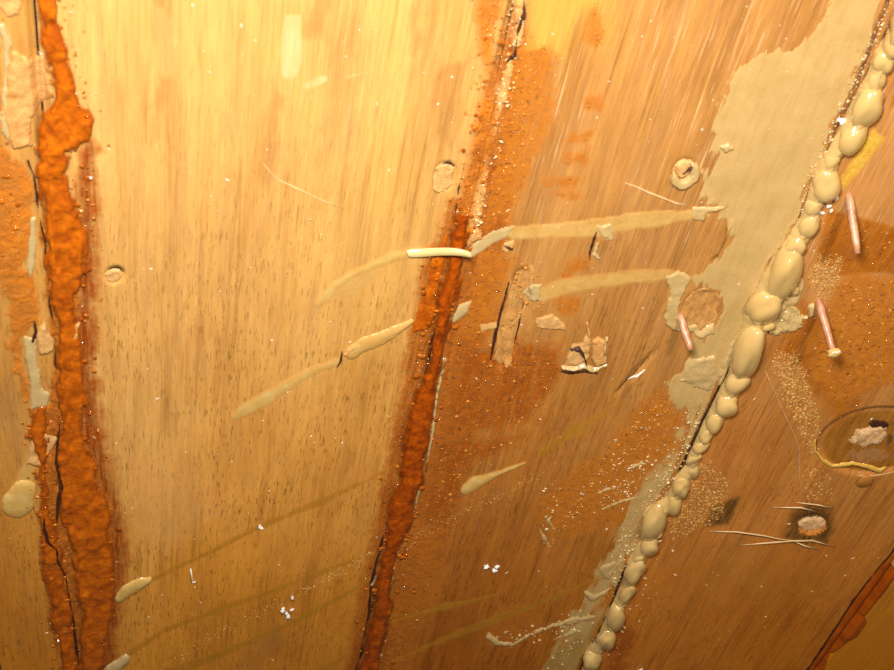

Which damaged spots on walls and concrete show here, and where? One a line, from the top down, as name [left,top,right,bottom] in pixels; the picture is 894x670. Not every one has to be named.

peeling [1,51,53,149]
crack [506,0,526,62]
crack [27,159,57,370]
crack [43,401,80,667]
corrosion [75,138,129,670]
corrosion [346,197,473,670]
crack [424,327,436,374]
corrosion [378,27,561,670]
peeling [561,323,608,373]
corrosion [540,393,681,538]
peeling [664,270,720,339]
peeling [768,278,815,336]